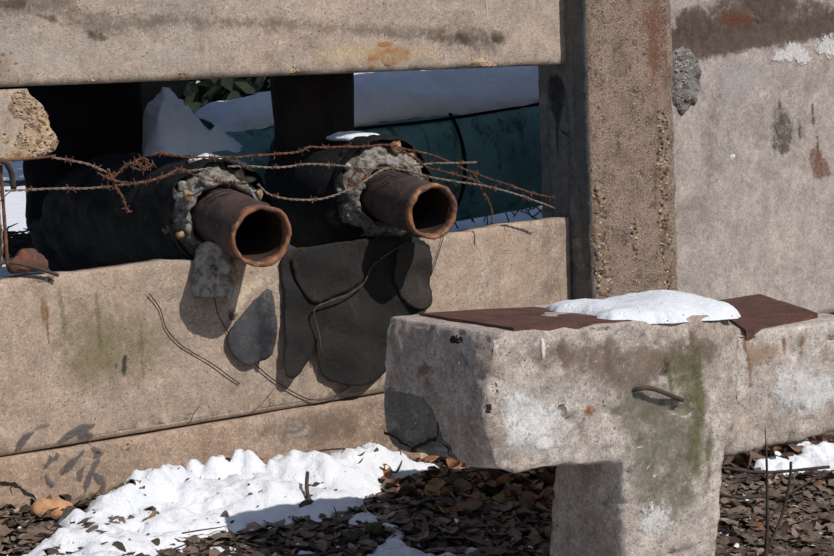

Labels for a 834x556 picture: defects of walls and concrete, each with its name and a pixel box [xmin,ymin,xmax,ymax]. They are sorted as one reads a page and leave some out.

leakage [671,0,834,59]
leakage [773,99,802,153]
spalling [0,90,59,283]
corrosion [810,136,831,177]
leakage [535,331,713,415]
spalling [384,387,459,461]
leakage [501,390,564,450]